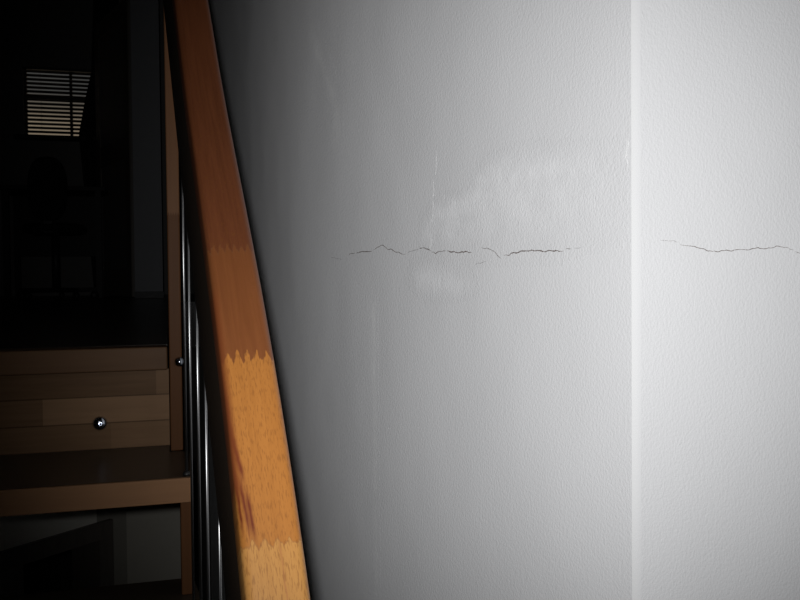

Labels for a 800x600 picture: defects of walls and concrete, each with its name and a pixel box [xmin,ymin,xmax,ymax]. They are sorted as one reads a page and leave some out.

crack [420,248,568,257]